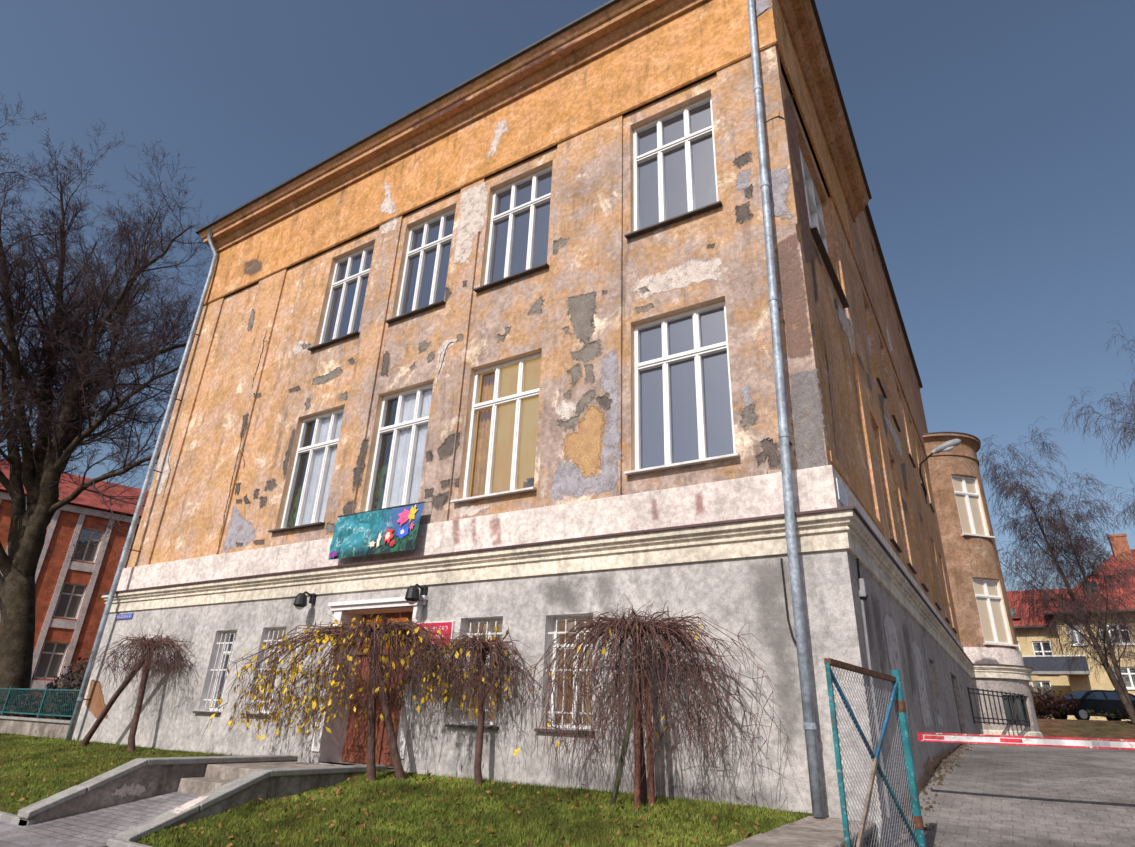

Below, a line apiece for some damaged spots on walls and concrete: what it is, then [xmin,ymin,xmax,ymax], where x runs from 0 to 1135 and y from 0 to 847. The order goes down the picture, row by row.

peeling [487,119,508,157]
peeling [451,182,488,265]
peeling [632,243,723,313]
spalling [555,291,613,477]